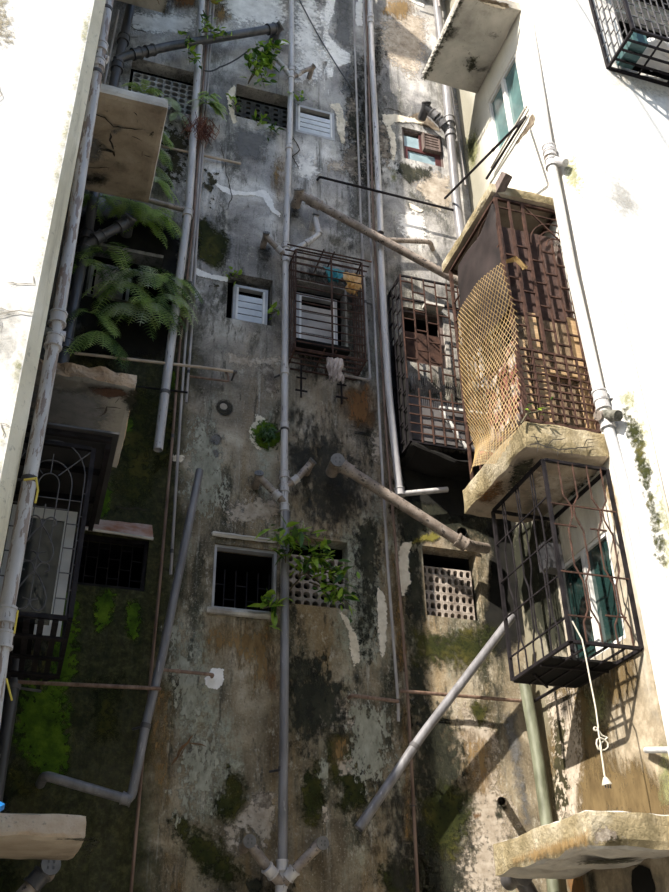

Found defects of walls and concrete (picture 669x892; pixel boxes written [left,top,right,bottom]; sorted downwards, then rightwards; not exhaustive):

damp [0,0,14,44]
damp [421,0,463,81]
crack [89,113,150,168]
damp [288,402,384,676]
peeling [398,532,440,596]
damp [388,449,568,658]
damp [622,407,666,566]
damp [279,652,493,892]
damp [504,713,529,822]